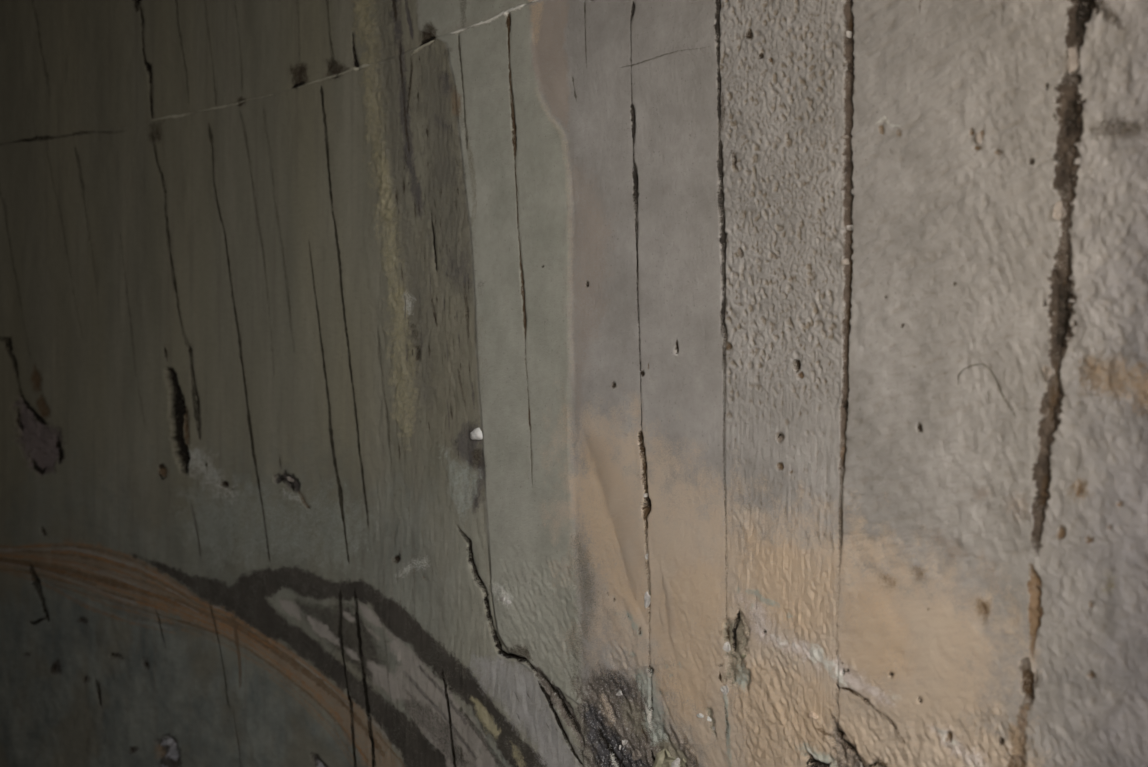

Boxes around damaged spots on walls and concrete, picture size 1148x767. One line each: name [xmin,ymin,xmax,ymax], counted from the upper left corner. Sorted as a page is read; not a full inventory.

crack [133,0,201,438]
crack [506,13,533,487]
crack [0,337,25,399]
crack [458,528,536,671]
damp [633,665,670,748]
spalling [718,605,767,695]